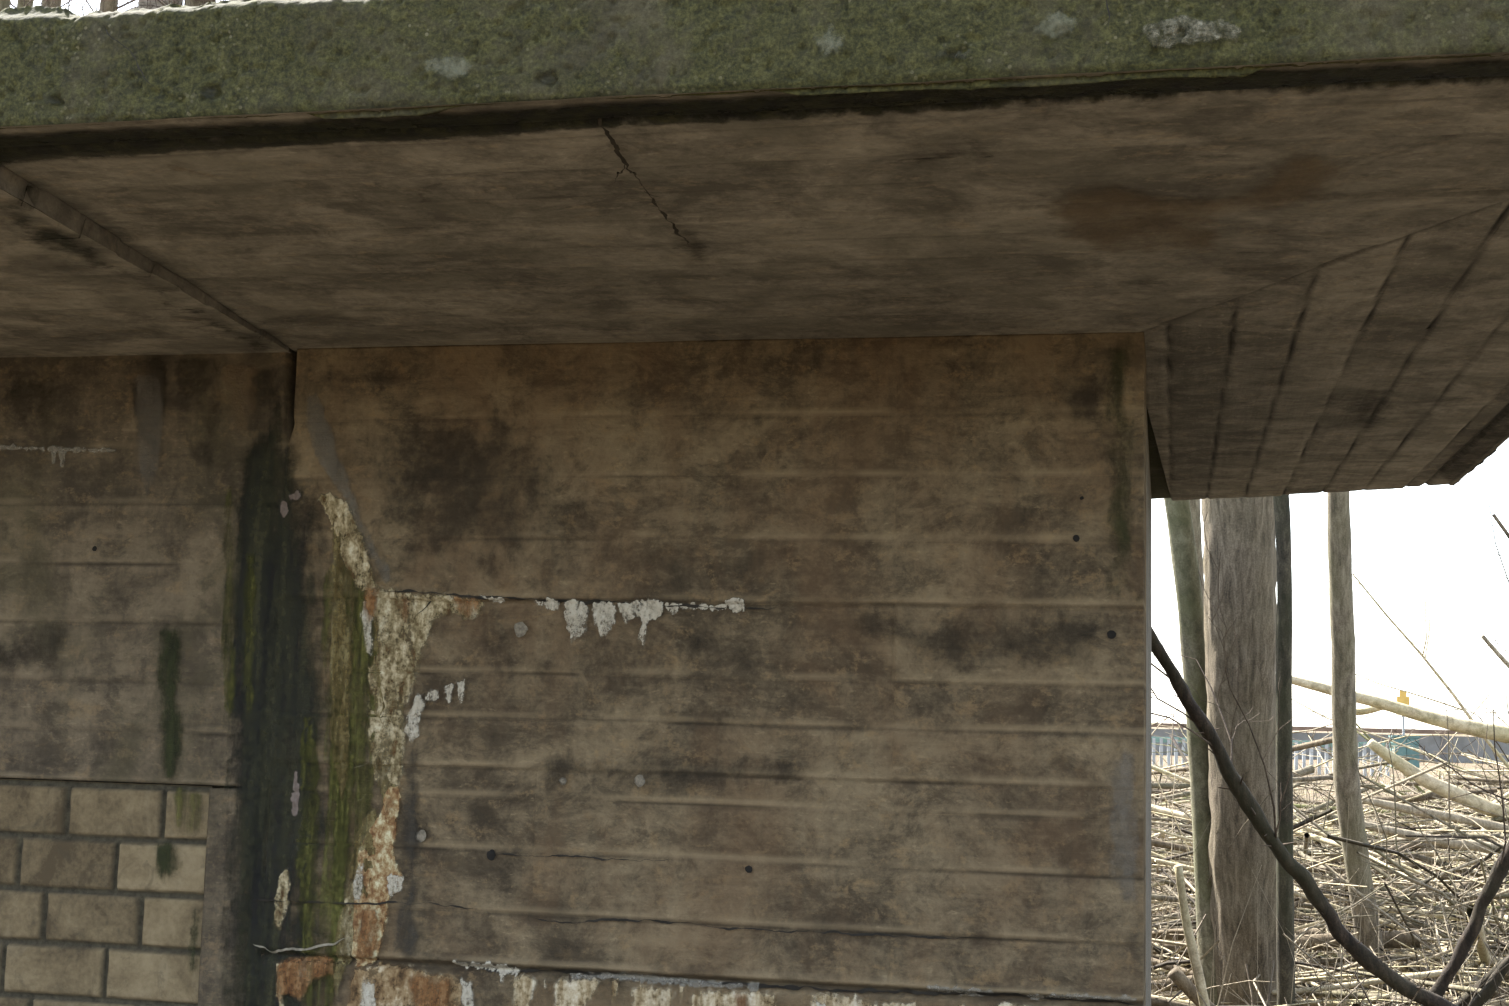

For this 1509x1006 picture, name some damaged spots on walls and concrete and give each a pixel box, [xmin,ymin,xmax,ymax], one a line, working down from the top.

crack [597,118,689,246]
leakage [0,186,113,268]
peeling [280,490,301,518]
leakage [536,597,744,645]
leakage [221,372,418,1006]
leakage [157,629,200,823]
peeling [351,679,465,967]
peeling [274,869,291,929]
corrosion [276,956,333,1006]
corrosion [347,961,474,1006]
leakage [452,960,1135,1006]